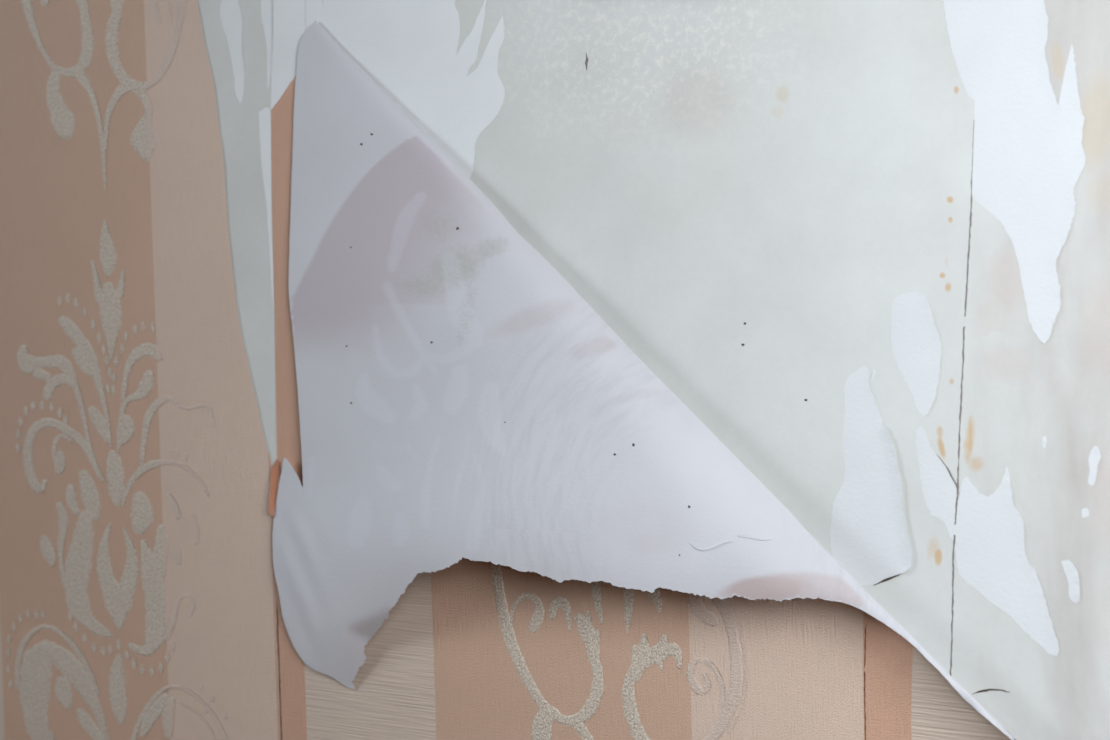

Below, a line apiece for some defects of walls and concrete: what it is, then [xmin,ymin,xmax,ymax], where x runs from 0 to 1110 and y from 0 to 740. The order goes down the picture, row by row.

peeling [943,0,1086,344]
peeling [269,21,1016,740]
peeling [891,292,1059,656]
peeling [1061,560,1080,603]
peeling [1088,446,1101,486]